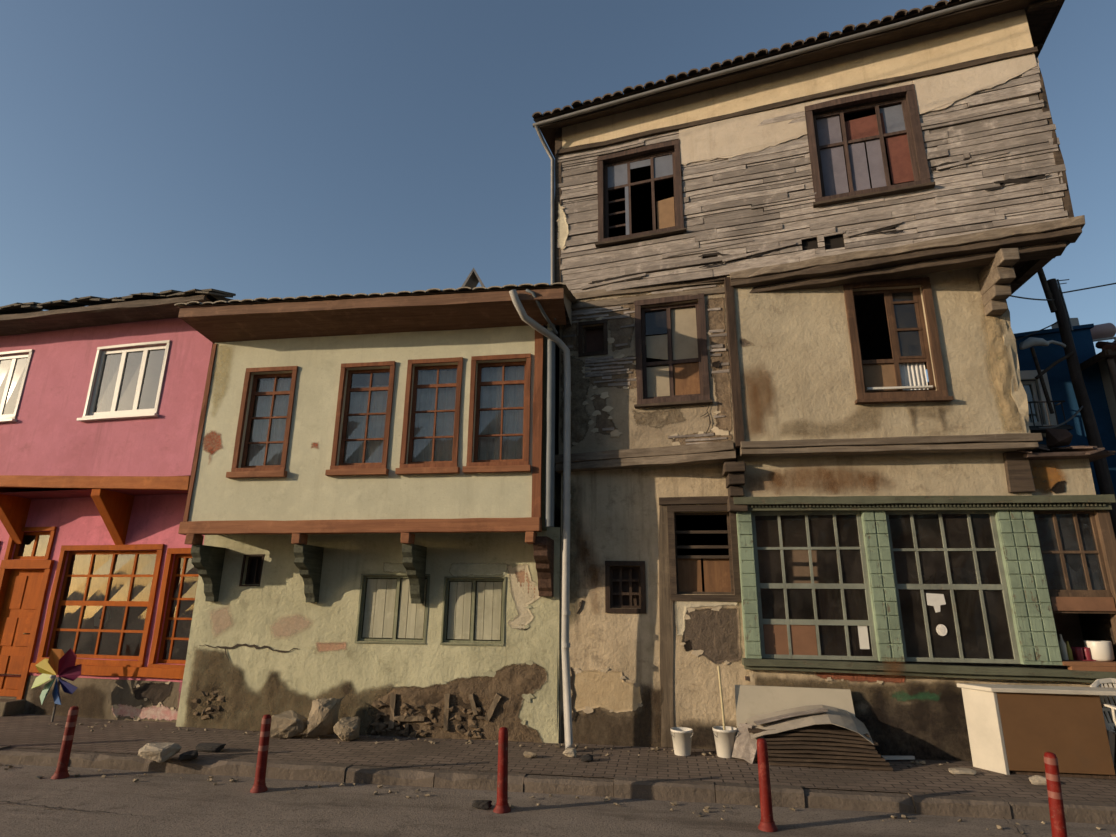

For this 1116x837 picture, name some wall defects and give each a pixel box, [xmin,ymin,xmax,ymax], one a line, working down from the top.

flaking render [560,285,752,447]
spalling [1050,481,1065,494]
crack [199,644,298,660]
spalling [675,601,742,665]
peeling [111,681,182,721]
flaking render [571,668,643,714]